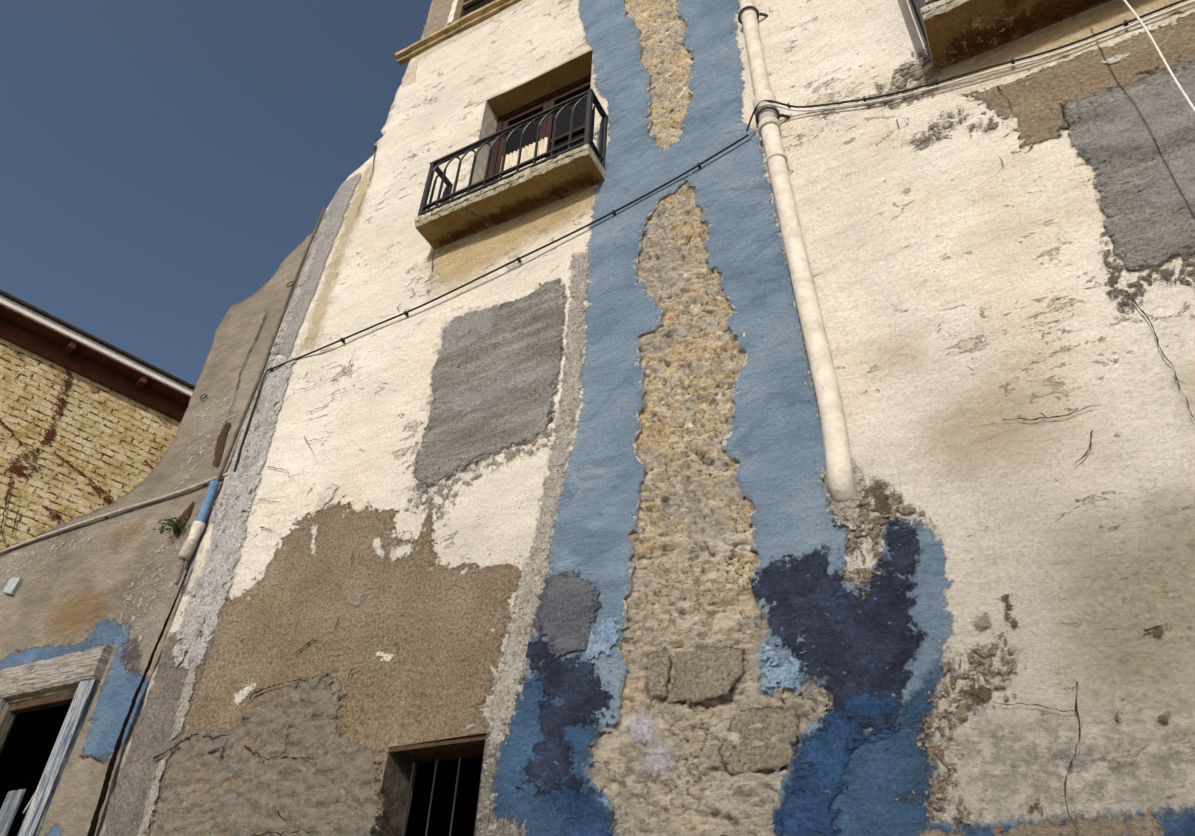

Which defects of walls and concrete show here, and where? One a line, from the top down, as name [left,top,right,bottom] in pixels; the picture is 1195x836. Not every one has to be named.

spalling [624,0,694,150]
corrosion [949,0,1110,63]
crack [1121,291,1195,420]
spalling [582,182,835,836]
crack [153,721,313,768]
peeling [137,482,528,836]
crack [936,681,1083,836]
peeling [895,593,1165,836]